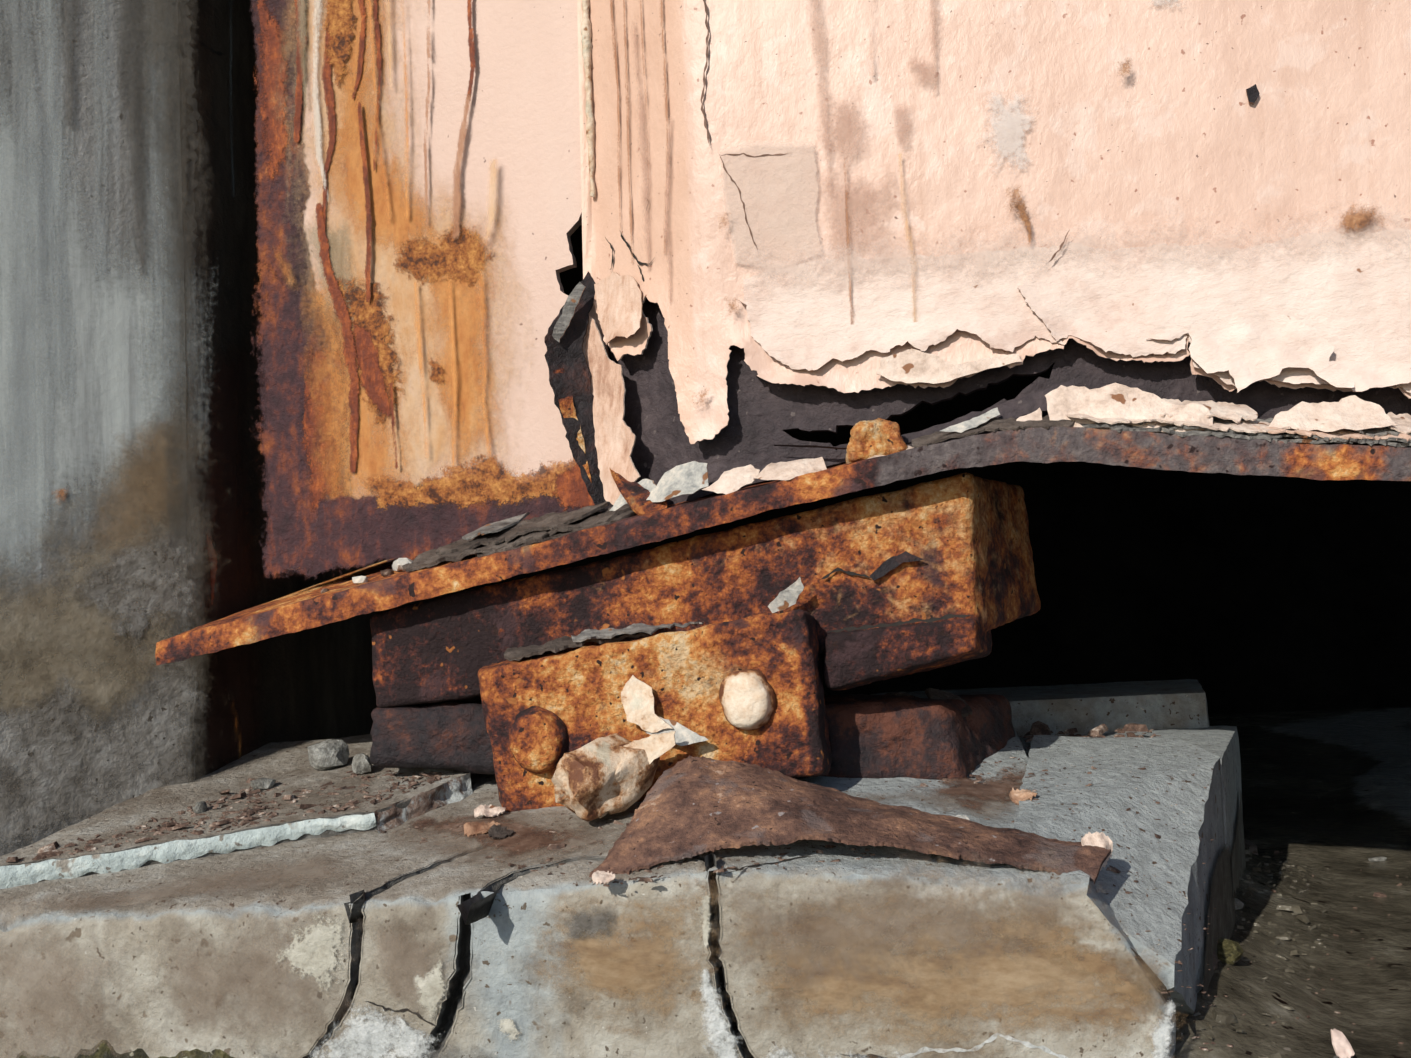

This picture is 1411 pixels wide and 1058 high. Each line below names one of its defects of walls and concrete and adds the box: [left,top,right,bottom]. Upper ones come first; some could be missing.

damp [0,0,203,782]
rust [195,0,670,627]
peeling [585,271,827,511]
peeling [743,228,1411,433]
rust [901,378,1411,448]
rust [198,643,259,768]
rust [504,621,704,661]
rust [817,551,925,581]
damp [0,939,103,1058]
damp [175,923,315,1028]
crack [301,842,607,1058]
crack [693,853,806,1058]